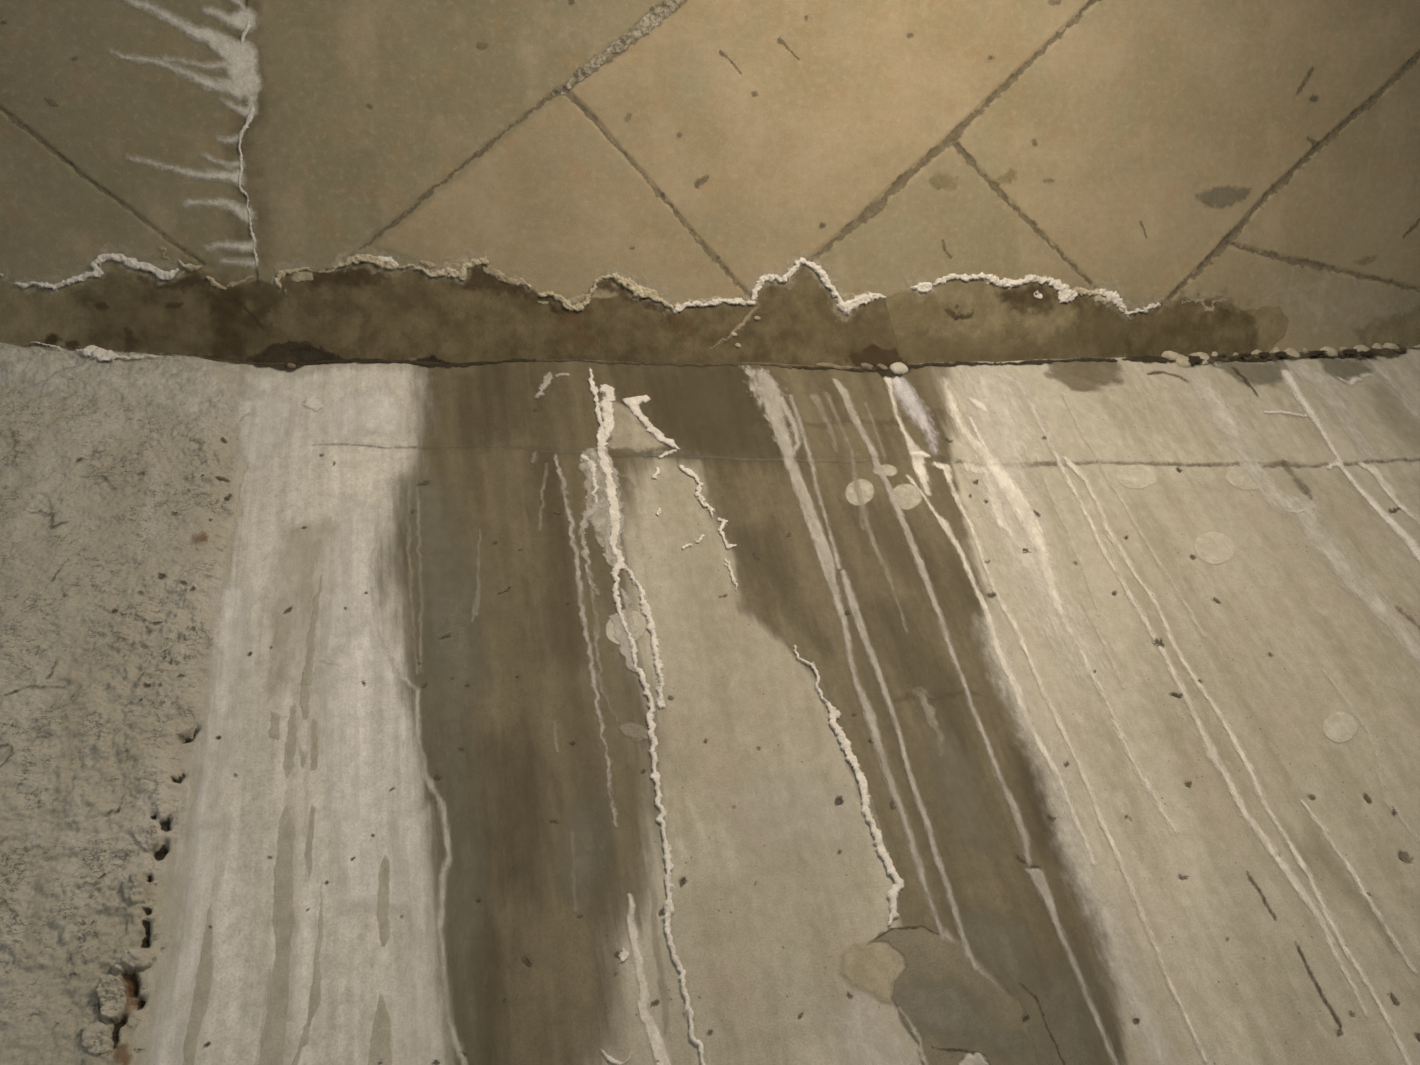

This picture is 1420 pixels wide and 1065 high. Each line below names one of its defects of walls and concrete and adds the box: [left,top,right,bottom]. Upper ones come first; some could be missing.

spalling [1161,343,1407,368]
water stain [0,247,1420,1065]
spalling [131,813,170,860]
spalling [80,873,163,1065]